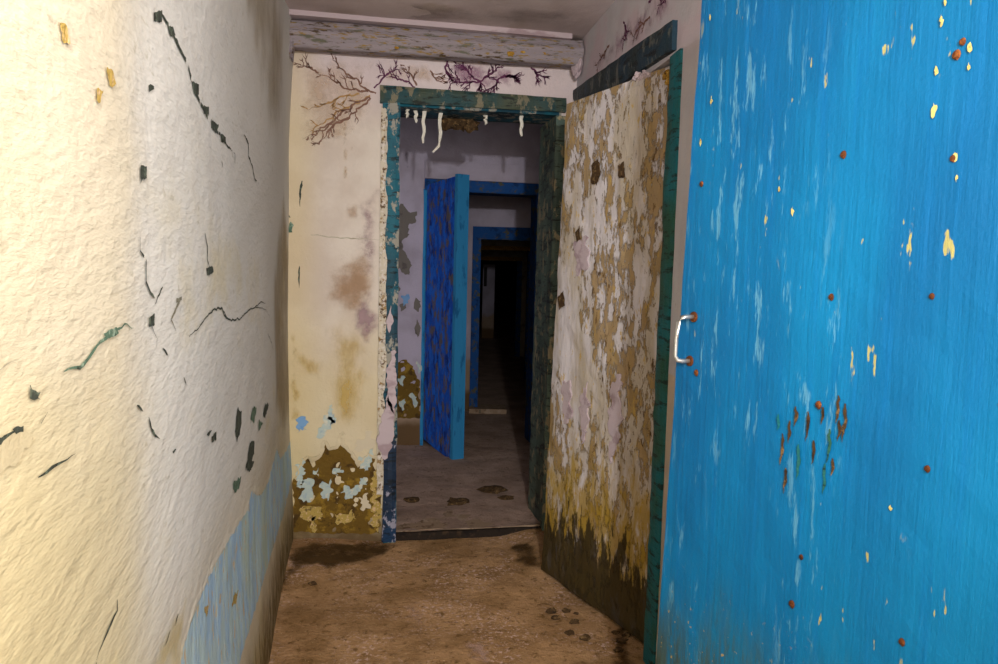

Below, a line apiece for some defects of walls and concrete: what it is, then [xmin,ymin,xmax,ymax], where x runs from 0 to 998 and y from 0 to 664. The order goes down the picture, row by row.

water stain [293,53,550,146]
water stain [341,268,374,335]
peeling [607,374,624,464]
peeling [180,350,422,664]